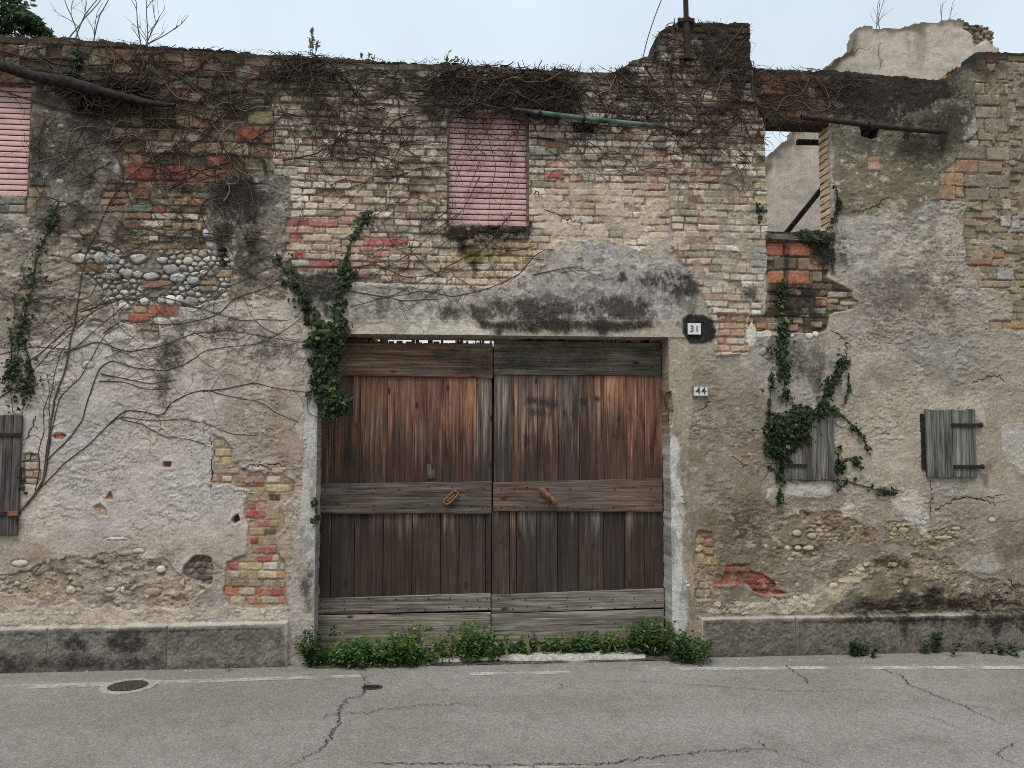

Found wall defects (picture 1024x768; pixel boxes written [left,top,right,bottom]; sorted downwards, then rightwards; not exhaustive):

spalling [939,52,1024,295]
flaking render [75,246,231,342]
water stain [441,272,699,335]
spalling [0,404,316,625]
flaking render [668,392,1024,634]
crack [929,480,1009,520]